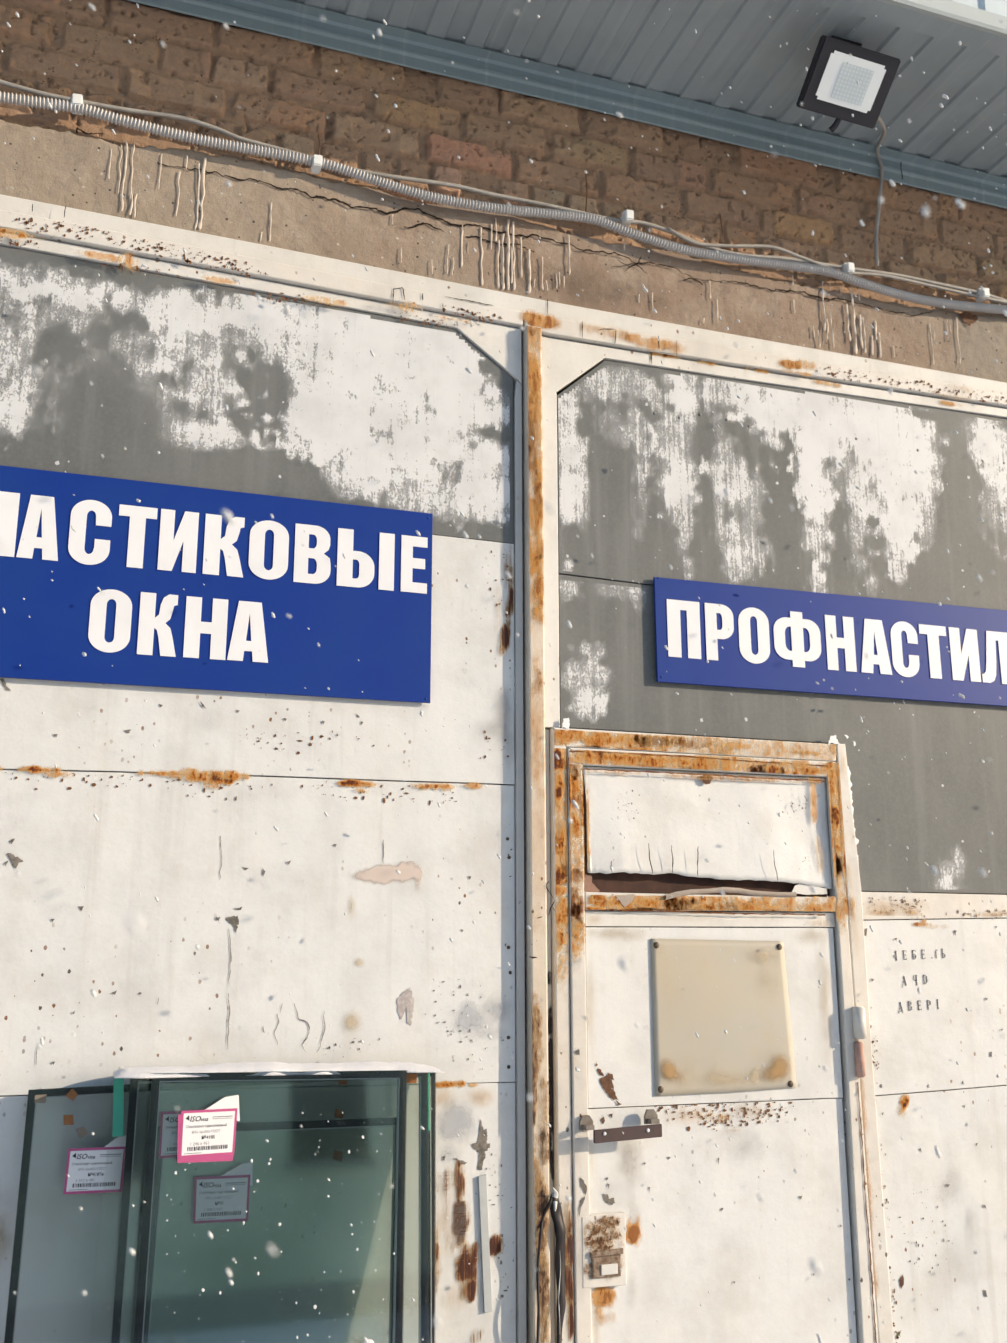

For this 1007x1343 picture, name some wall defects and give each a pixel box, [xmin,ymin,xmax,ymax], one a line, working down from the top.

leakage [108,141,137,217]
leakage [175,155,207,229]
corrosion [0,217,345,307]
leakage [431,218,571,293]
leakage [812,281,895,358]
peeling [0,266,510,524]
corrosion [523,311,558,623]
peeling [558,368,948,598]
peeling [967,418,1007,559]
peeling [561,644,609,729]
corrosion [0,765,272,801]
corrosion [554,729,927,979]